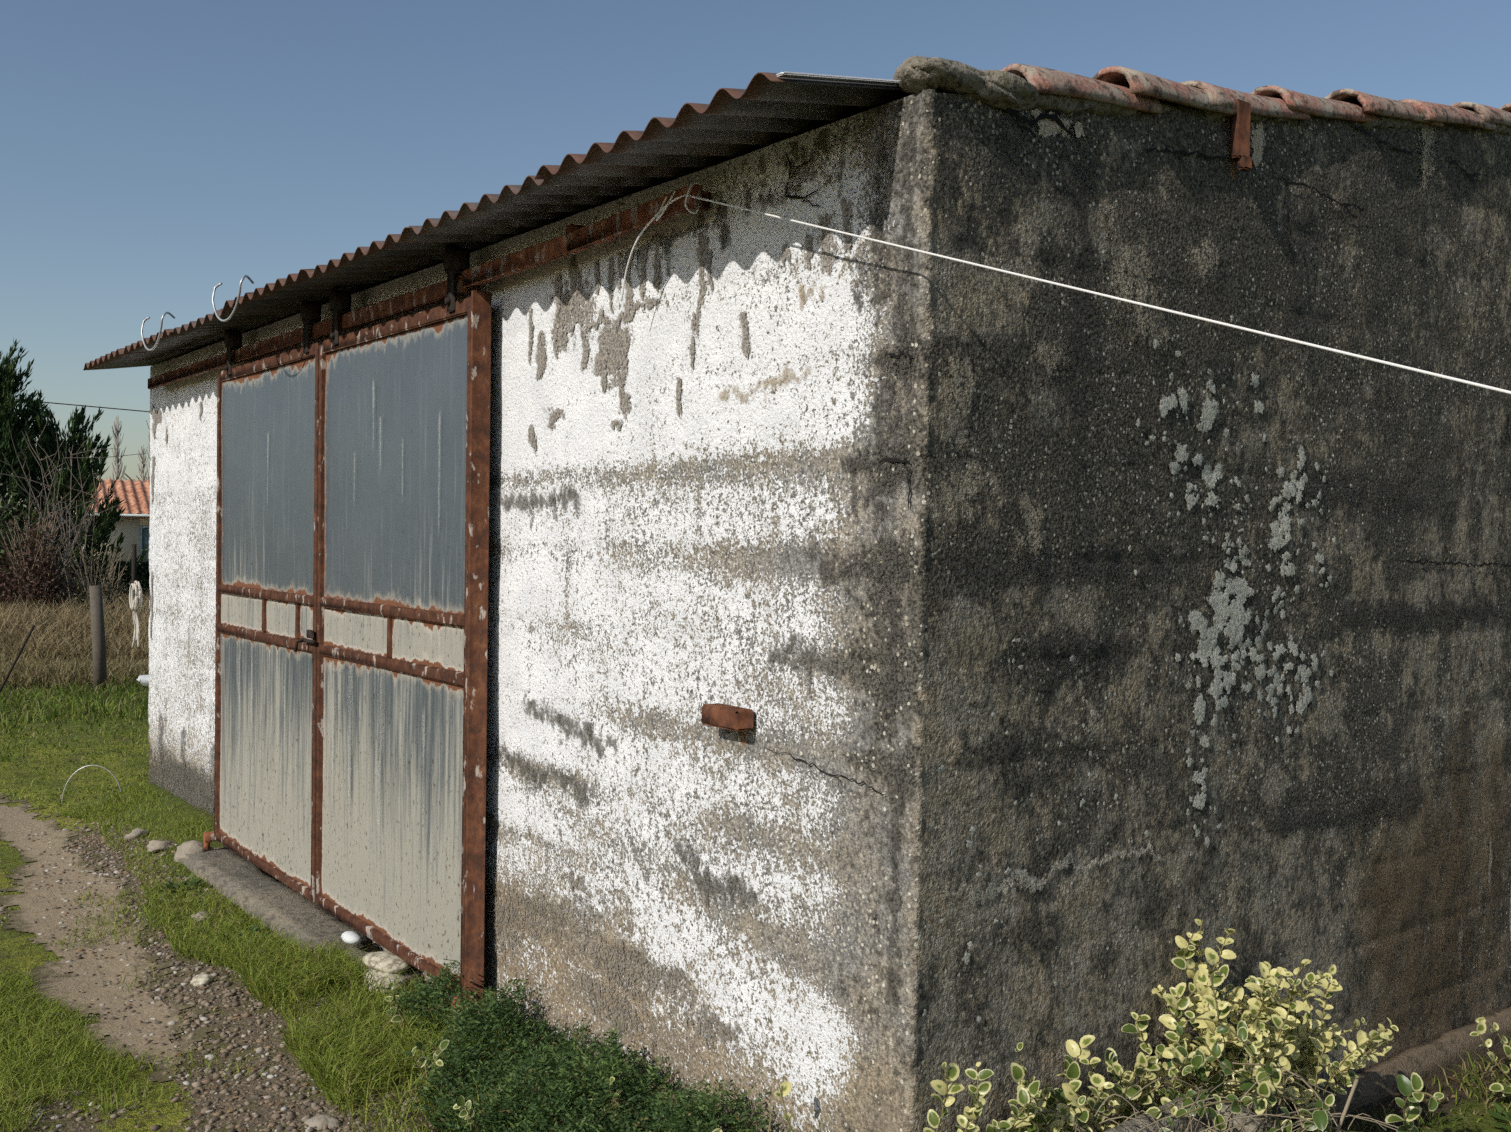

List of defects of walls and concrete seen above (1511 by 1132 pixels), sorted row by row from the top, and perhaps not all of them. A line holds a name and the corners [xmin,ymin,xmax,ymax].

crack [784,138,820,207]
crack [1141,147,1233,169]
crack [1273,173,1366,220]
crack [1348,120,1484,188]
leakage [627,189,777,278]
leakage [765,111,917,718]
peeling [1102,225,1353,856]
crack [1389,558,1511,643]
leakage [522,694,619,759]
leakage [498,738,592,808]
leakage [673,839,758,910]
leakage [883,754,904,1013]